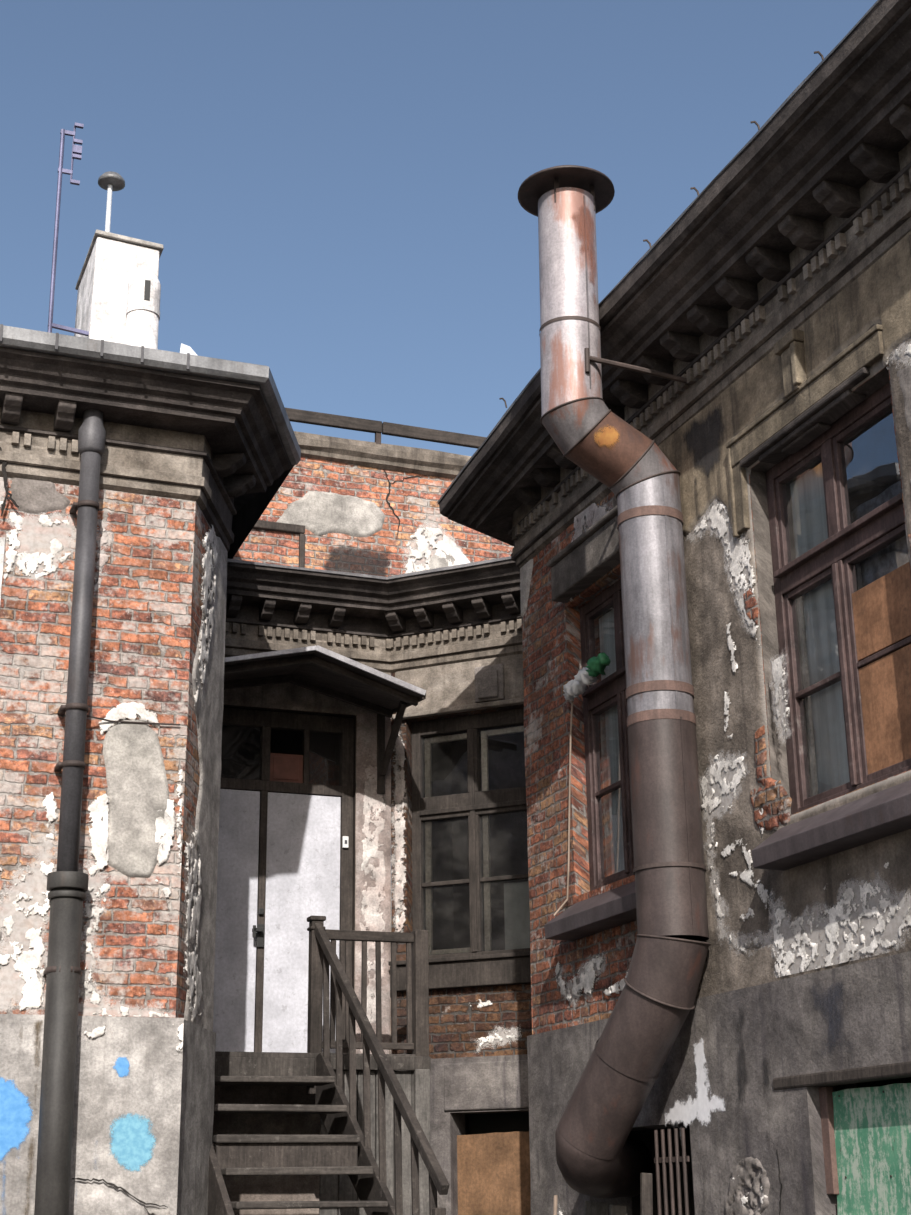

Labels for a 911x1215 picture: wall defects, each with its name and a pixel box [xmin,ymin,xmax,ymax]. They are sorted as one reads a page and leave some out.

corrosion [573,208,595,283]
corrosion [595,427,618,447]
peeling [0,477,76,579]
peeling [194,524,217,706]
crack [383,469,427,536]
peeling [404,523,470,574]
peeling [687,499,760,672]
peeling [700,656,911,977]
peeling [0,792,58,1014]
peeling [77,769,204,1055]
crack [72,1178,168,1215]
crack [775,1149,783,1215]